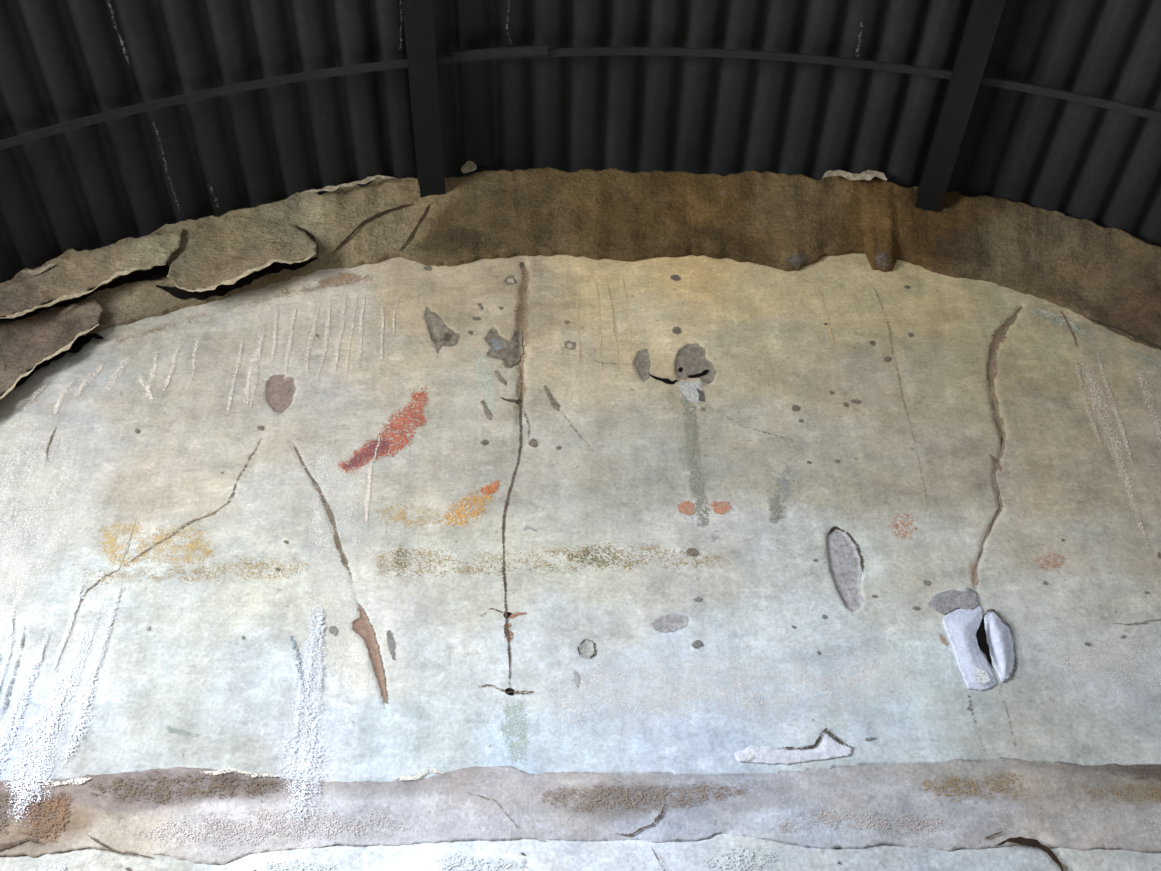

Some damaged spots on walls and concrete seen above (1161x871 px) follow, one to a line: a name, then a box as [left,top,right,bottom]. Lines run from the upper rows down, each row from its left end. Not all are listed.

water stain [822,170,887,181]
water stain [0,584,120,822]
crack [74,438,261,614]
crack [293,444,387,703]
spalling [424,303,524,386]
crack [479,263,534,695]
spalling [672,326,716,411]
spalling [814,526,877,611]
crack [969,306,1021,586]
peeling [984,611,1015,682]
water stain [1074,352,1149,548]
crack [985,831,1068,871]